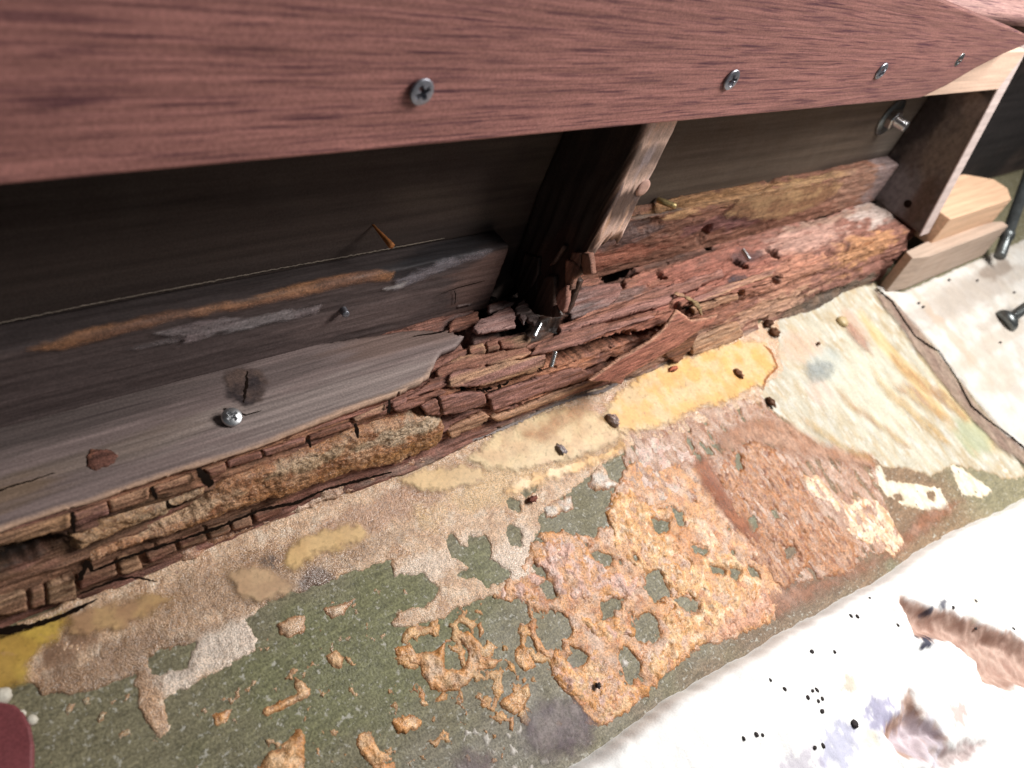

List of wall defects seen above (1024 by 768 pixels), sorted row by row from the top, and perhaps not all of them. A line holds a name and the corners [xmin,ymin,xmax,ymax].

crack [224,371,262,415]
leakage [0,538,40,562]
peeling [373,461,782,768]
leakage [44,634,95,672]
peeling [212,709,232,726]